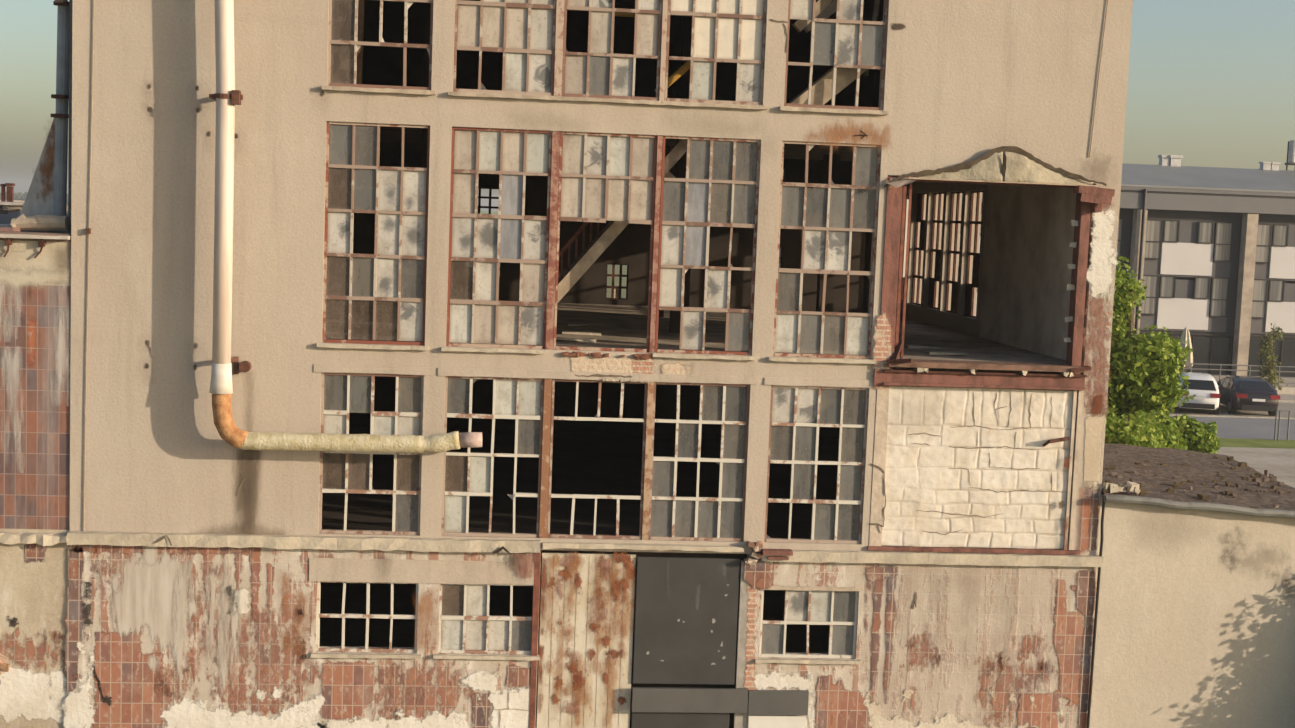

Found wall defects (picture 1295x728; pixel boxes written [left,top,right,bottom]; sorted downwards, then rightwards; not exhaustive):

corrosion [826,127,885,144]
peeling [25,319,37,364]
spalling [873,313,892,389]
flaking render [1059,209,1118,552]
crack [868,464,886,533]
crack [909,392,1061,535]
peeling [0,543,531,728]
corrosion [511,551,637,720]
peeling [743,541,1096,728]